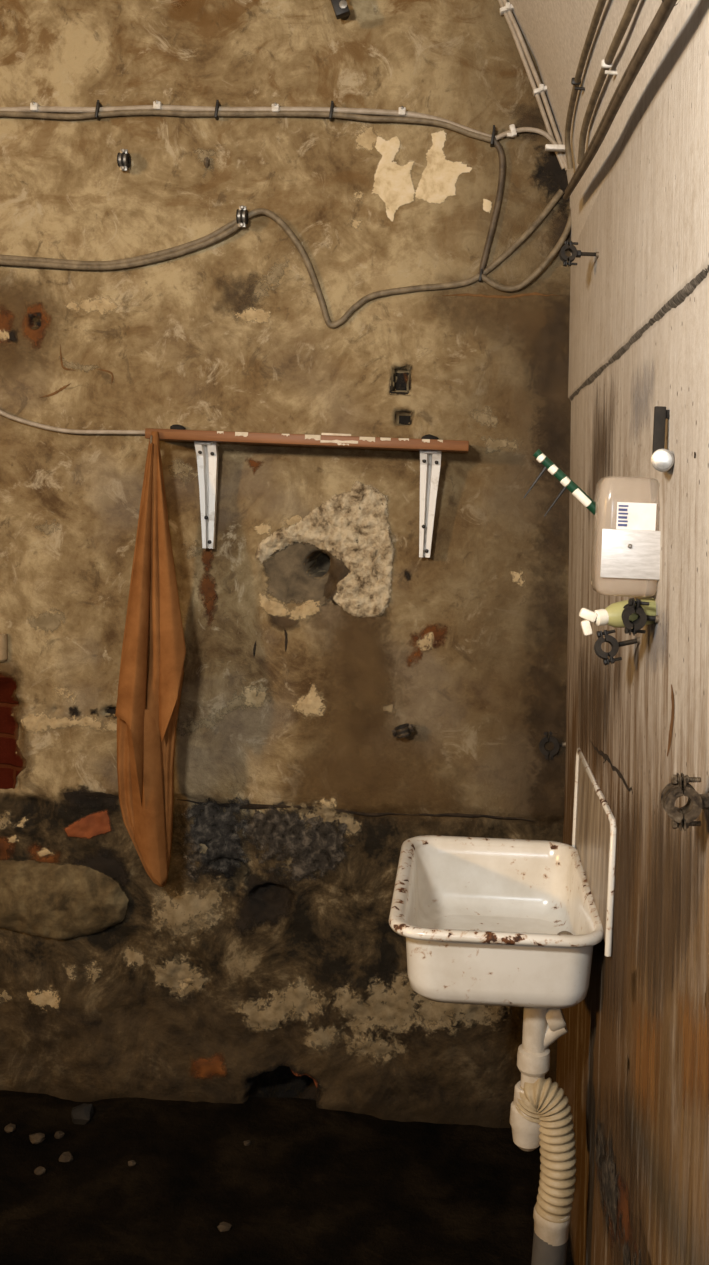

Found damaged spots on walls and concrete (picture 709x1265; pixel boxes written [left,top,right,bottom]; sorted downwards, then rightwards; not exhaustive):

peeling [353,125,472,221]
spalling [254,481,411,630]
spalling [245,1065,321,1108]
leakage [584,1087,706,1265]